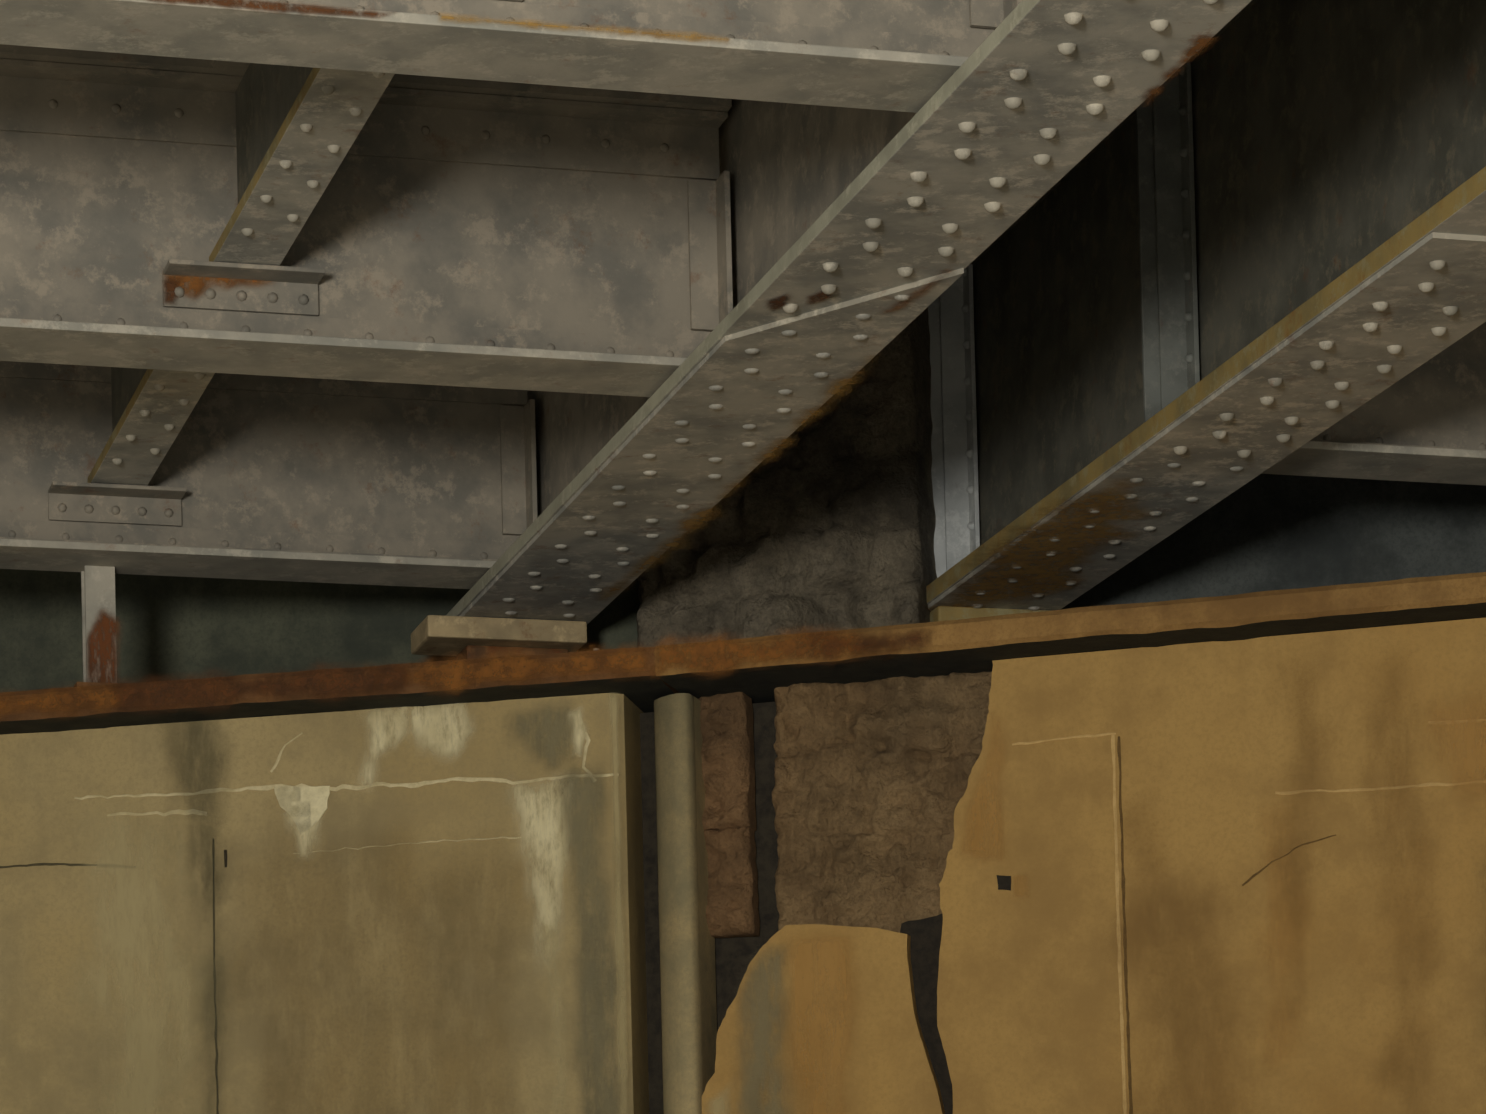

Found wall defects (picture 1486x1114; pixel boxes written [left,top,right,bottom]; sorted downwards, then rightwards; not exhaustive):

corrosion [165,275,263,302]
corrosion [88,613,119,683]
spalling [698,672,992,938]